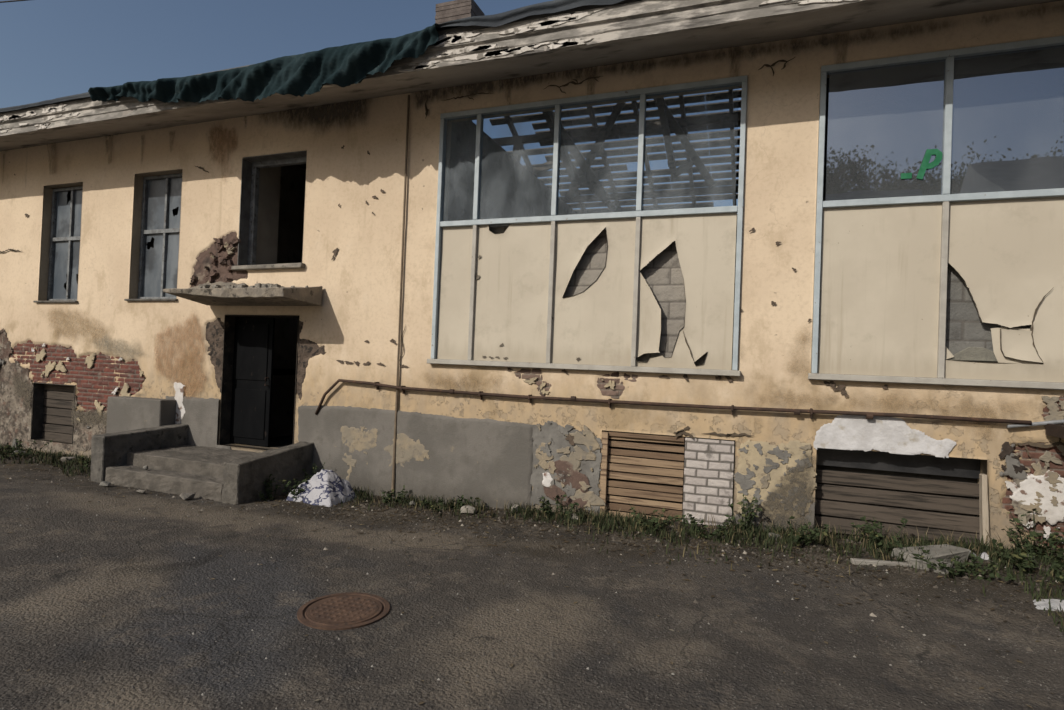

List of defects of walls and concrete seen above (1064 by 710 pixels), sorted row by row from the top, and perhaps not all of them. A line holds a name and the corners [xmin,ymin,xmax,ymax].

peeling [399,8,606,72]
peeling [0,103,80,134]
peeling [189,238,236,285]
spalling [562,227,608,298]
spalling [948,263,1044,364]
flaking render [0,329,145,453]
spalling [597,371,638,399]
flaking render [1041,396,1064,427]
spalling [534,423,606,508]
peeling [998,442,1064,549]